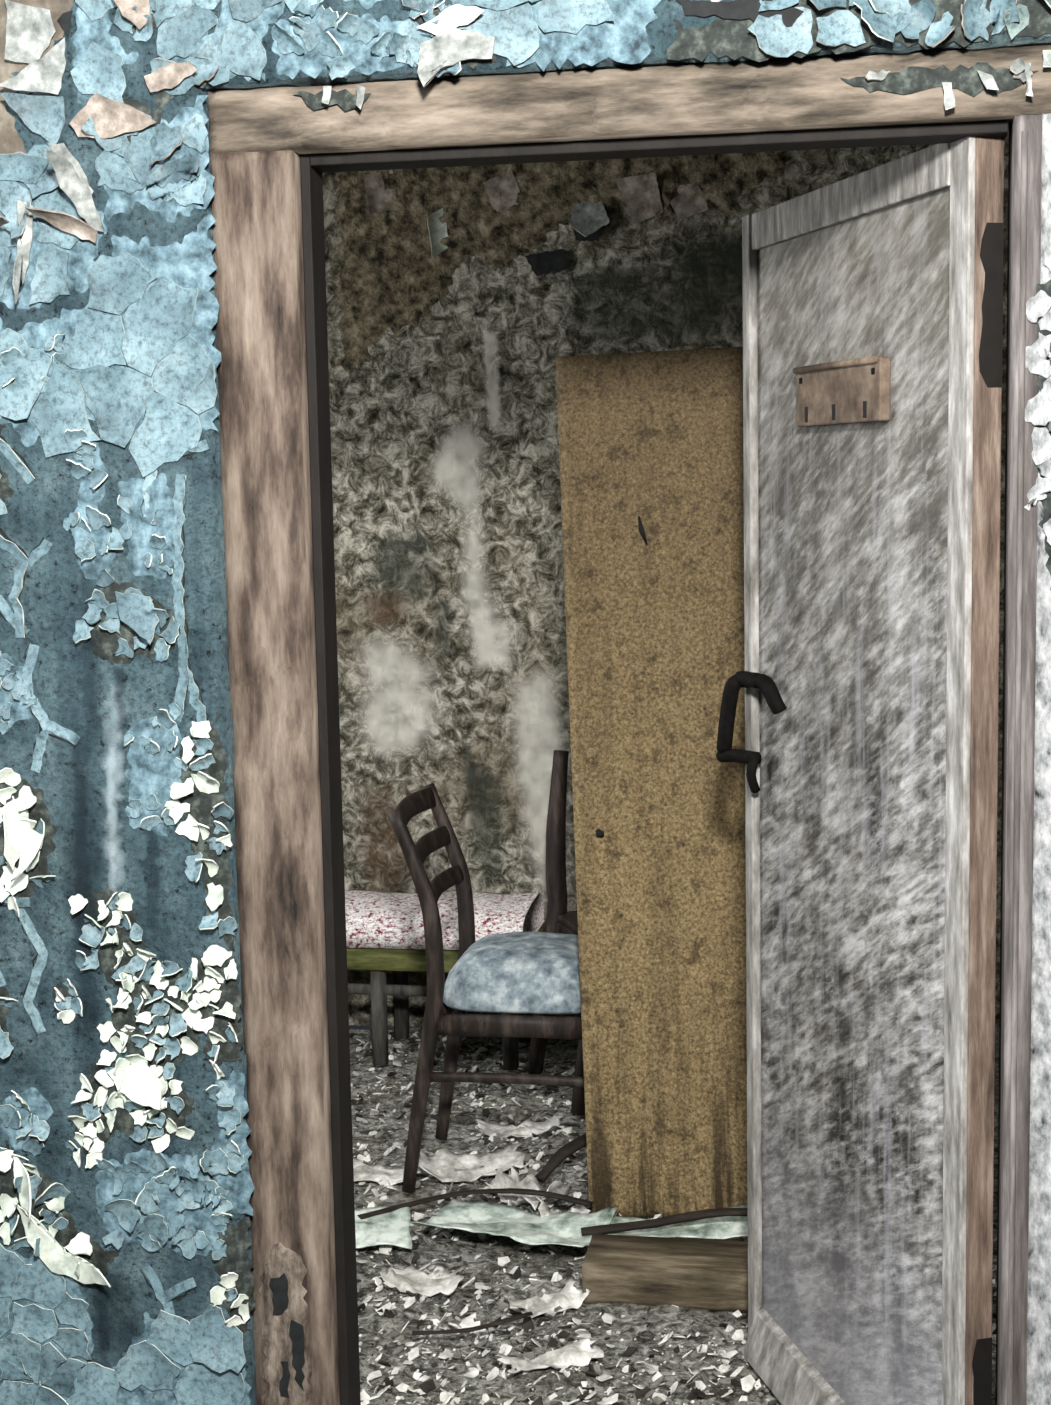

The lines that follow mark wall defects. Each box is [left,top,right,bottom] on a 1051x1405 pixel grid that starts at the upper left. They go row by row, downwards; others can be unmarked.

peeling [0,0,1051,664]
peeling [0,651,38,735]
peeling [0,703,305,1405]
crack [140,1262,197,1400]